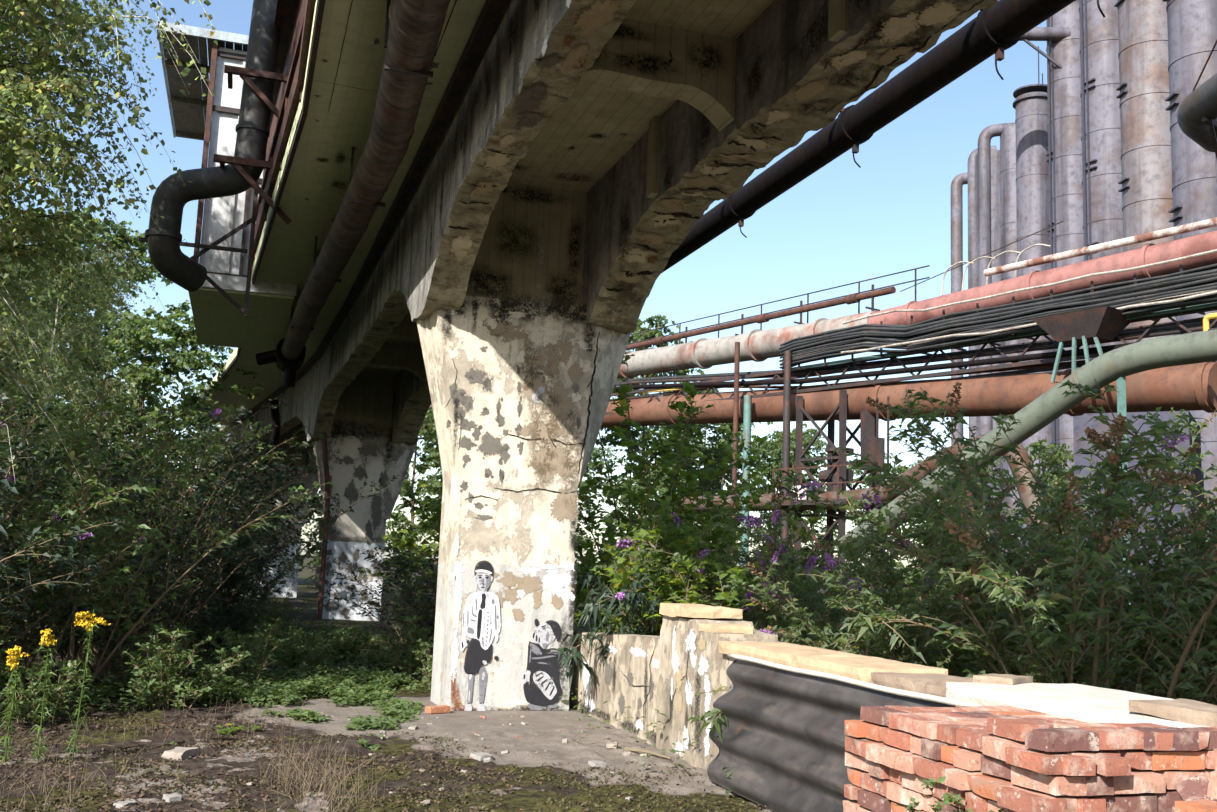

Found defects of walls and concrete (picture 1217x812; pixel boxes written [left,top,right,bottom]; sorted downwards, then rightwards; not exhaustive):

spalling [611,0,961,284]
flaking render [478,318,531,352]
flaking render [446,337,584,522]
water stain [443,224,595,490]
crack [465,332,600,500]
flaking render [315,444,389,619]